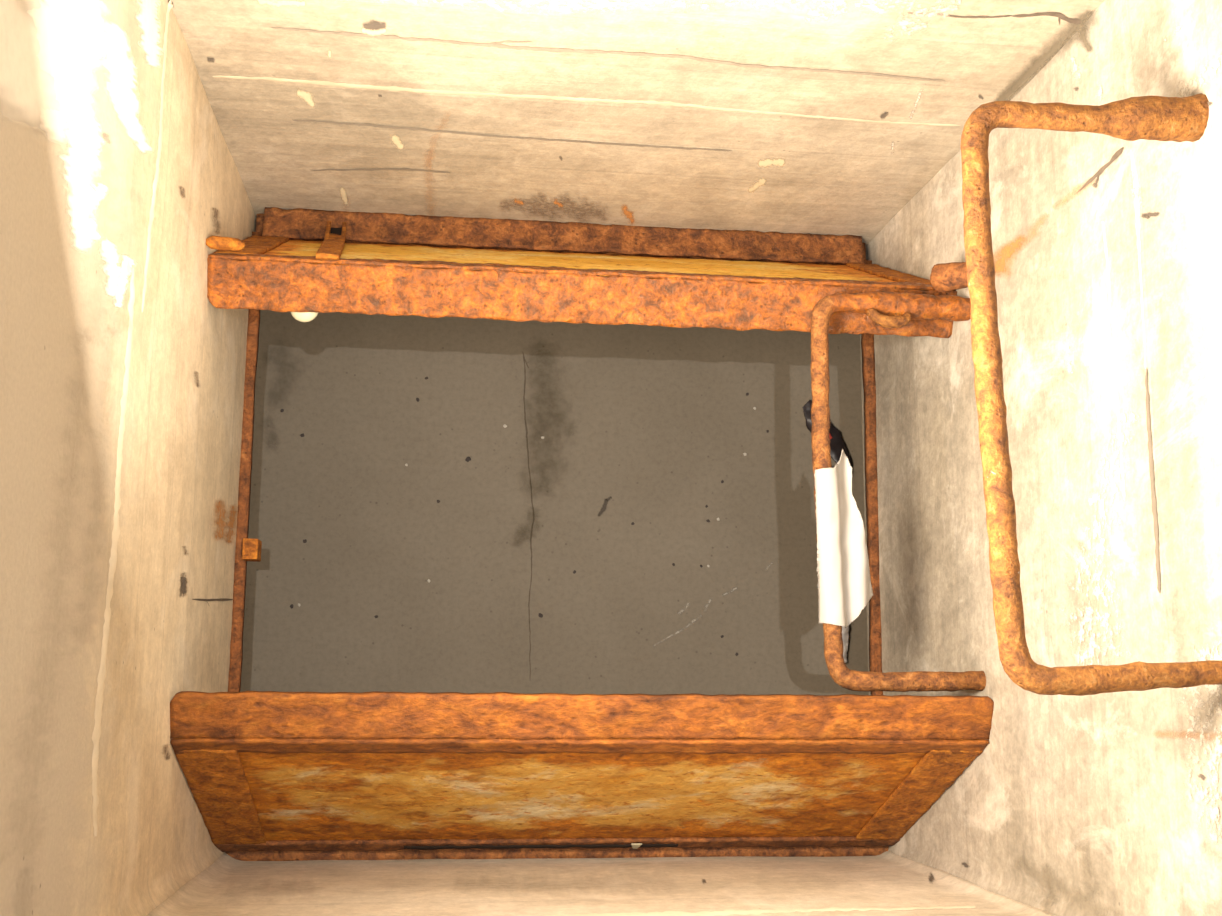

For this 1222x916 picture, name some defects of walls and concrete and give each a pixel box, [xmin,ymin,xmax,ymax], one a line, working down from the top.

peeling [0,0,163,308]
corrosion [994,218,1043,273]
crack [523,353,535,676]